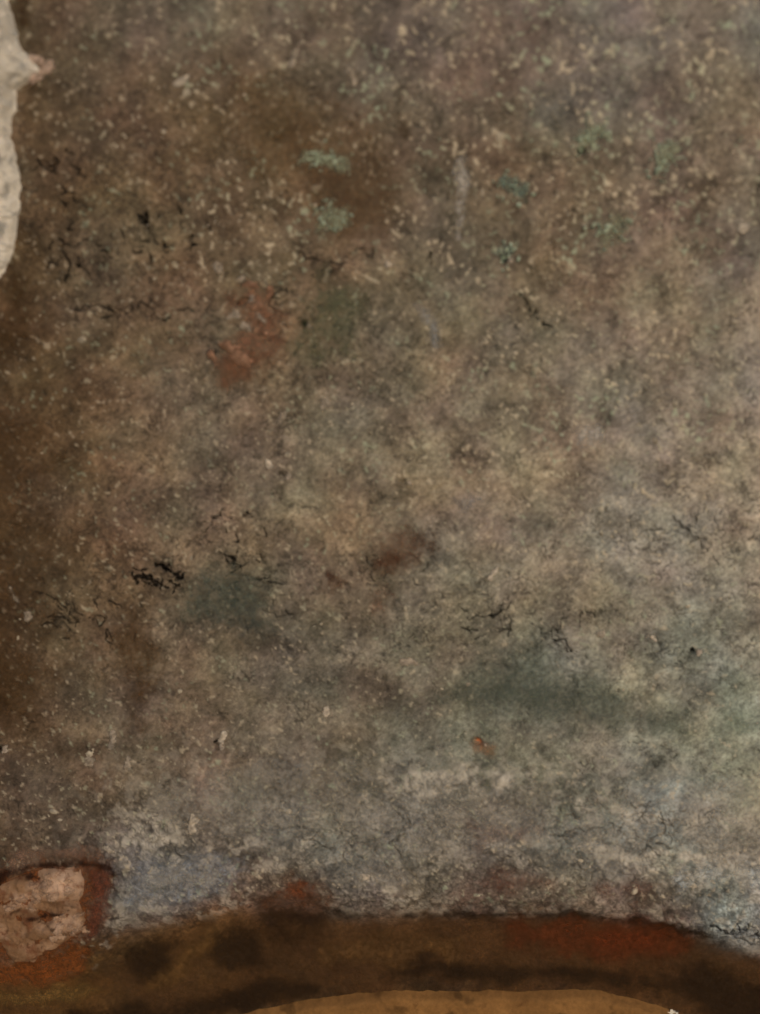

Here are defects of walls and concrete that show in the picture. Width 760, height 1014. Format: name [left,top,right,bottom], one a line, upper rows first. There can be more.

spalling [0,0,55,278]
rust [0,847,114,986]
peeling [50,916,90,942]
leakage [0,910,760,1014]